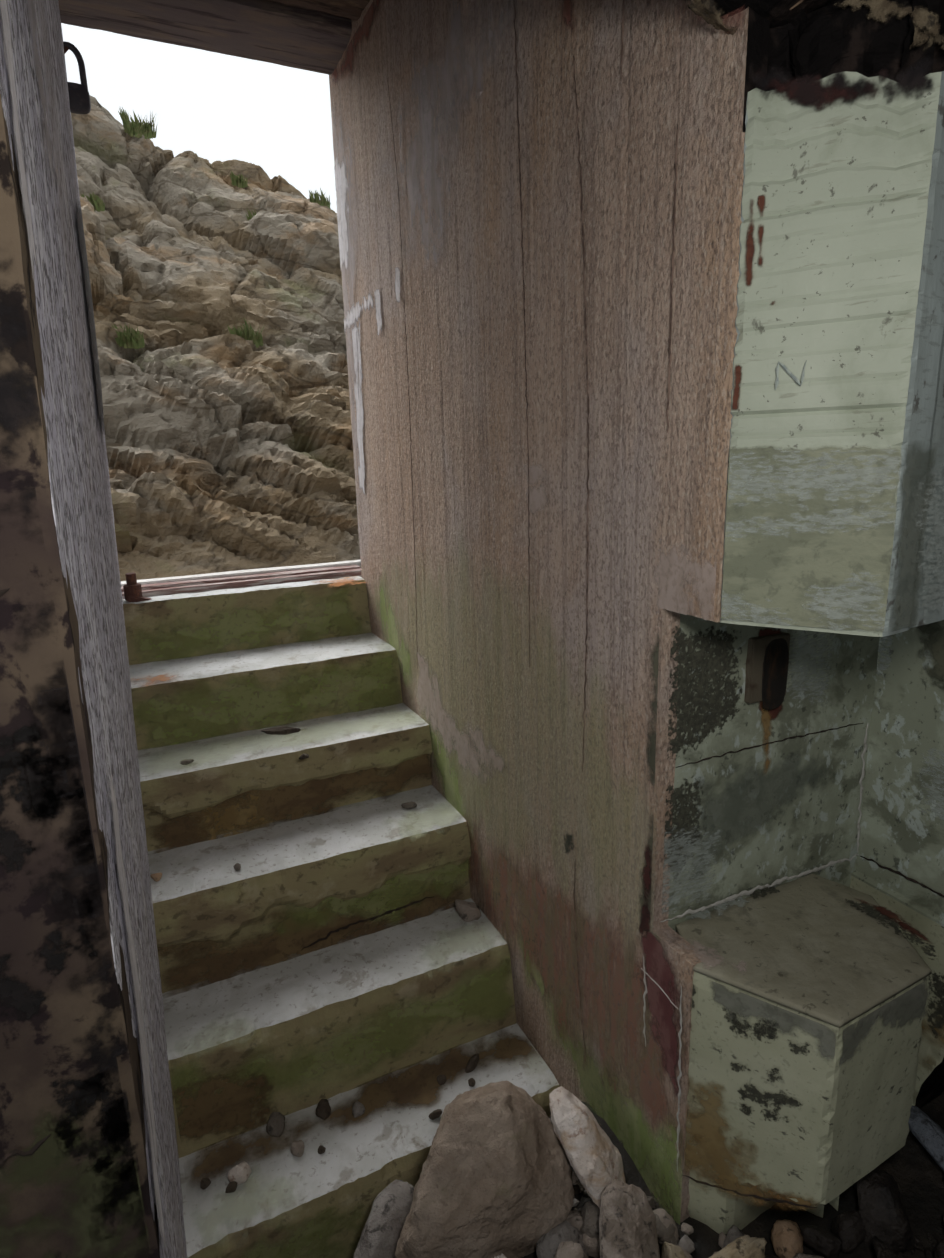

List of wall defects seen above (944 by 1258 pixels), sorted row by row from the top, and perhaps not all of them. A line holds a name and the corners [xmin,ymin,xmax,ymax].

spalling [688,0,737,35]
spalling [835,0,944,50]
leakage [0,0,37,278]
rust [746,195,765,286]
rust [732,365,742,410]
peeling [895,449,934,630]
rust [758,628,783,637]
rust [759,701,783,770]
peeling [639,546,822,1172]
spalling [846,899,936,960]
leakage [107,775,166,1250]